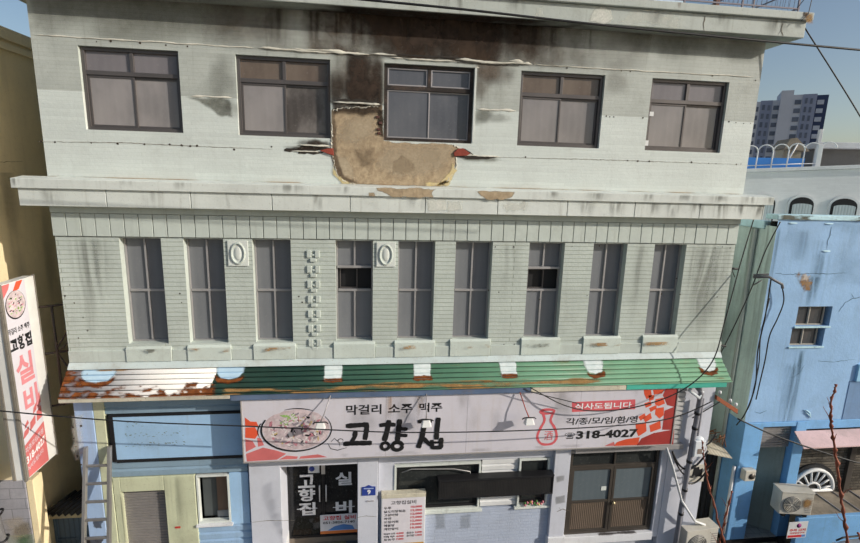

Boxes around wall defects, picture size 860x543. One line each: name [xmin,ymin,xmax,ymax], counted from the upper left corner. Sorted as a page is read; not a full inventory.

spalling [331,101,461,211]
spalling [478,191,514,200]
peeling [798,273,812,290]
corrosion [58,371,599,399]